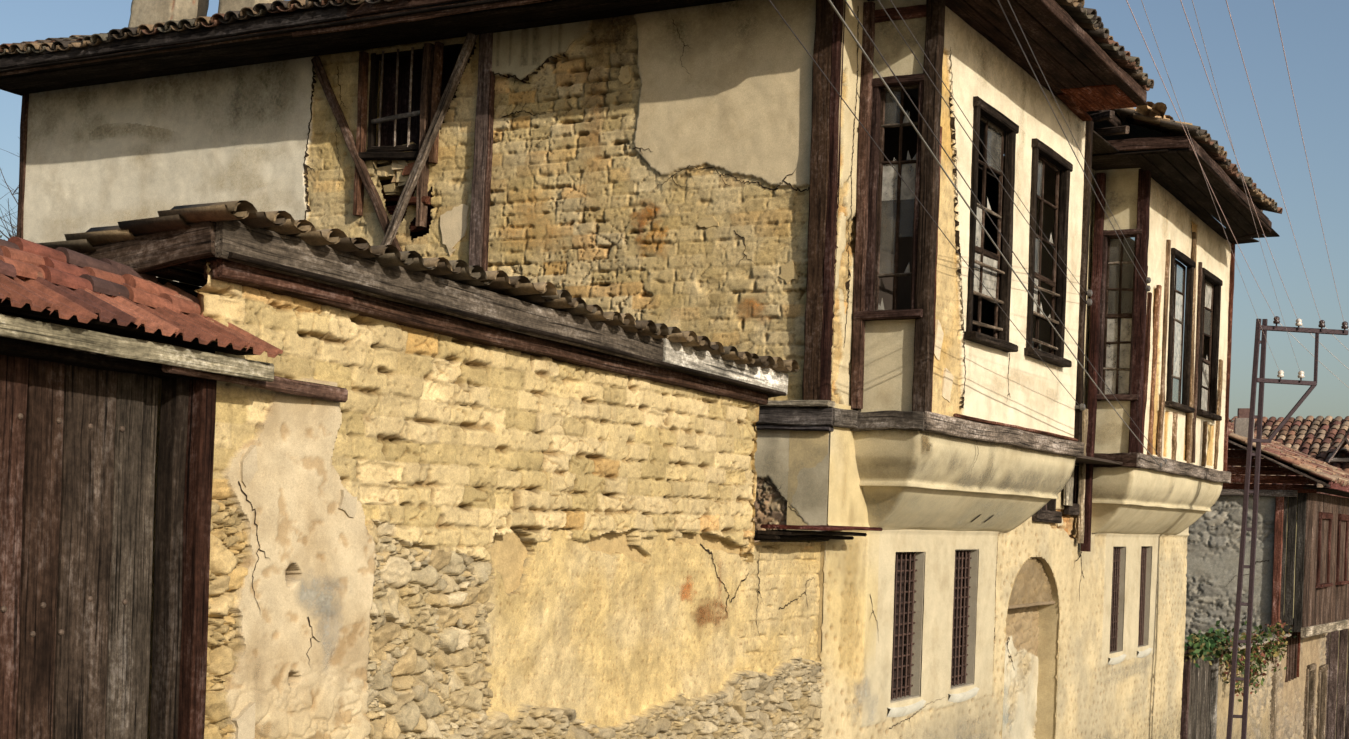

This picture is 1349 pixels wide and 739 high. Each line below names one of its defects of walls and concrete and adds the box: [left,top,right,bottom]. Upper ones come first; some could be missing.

crack [303,66,348,220]
spalling [376,142,470,256]
peeling [488,14,817,408]
crack [656,165,809,192]
crack [238,481,271,609]
crack [700,543,815,636]
peeling [1002,637,1038,739]